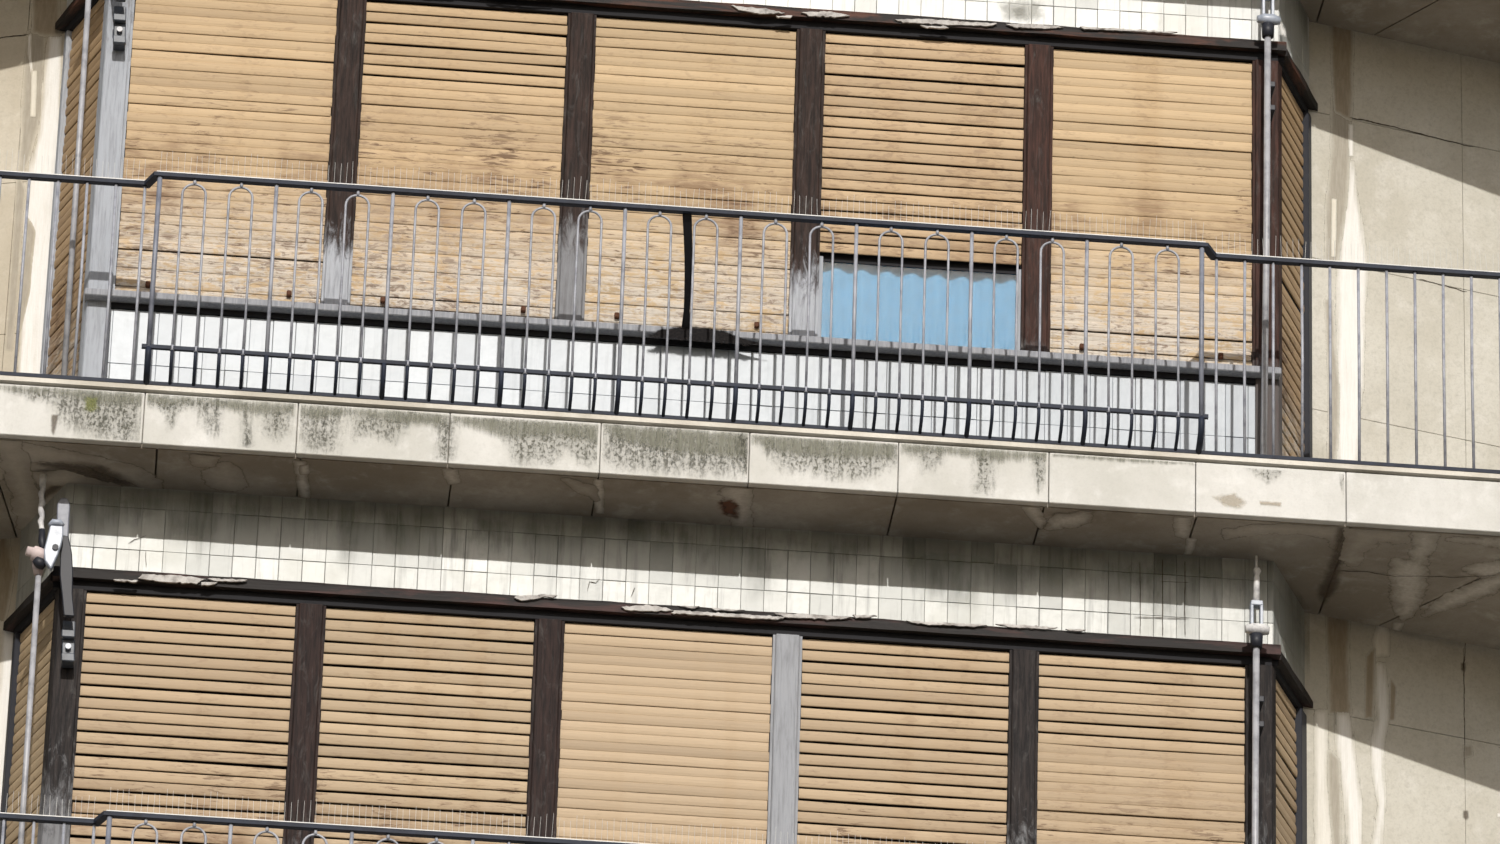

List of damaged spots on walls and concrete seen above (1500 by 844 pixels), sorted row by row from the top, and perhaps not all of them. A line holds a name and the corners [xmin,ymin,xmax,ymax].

damp [0,0,1172,809]
rust [719,500,738,518]
damp [1222,495,1242,506]
peeling [113,574,247,586]
peeling [621,604,877,621]
damp [1221,524,1500,844]